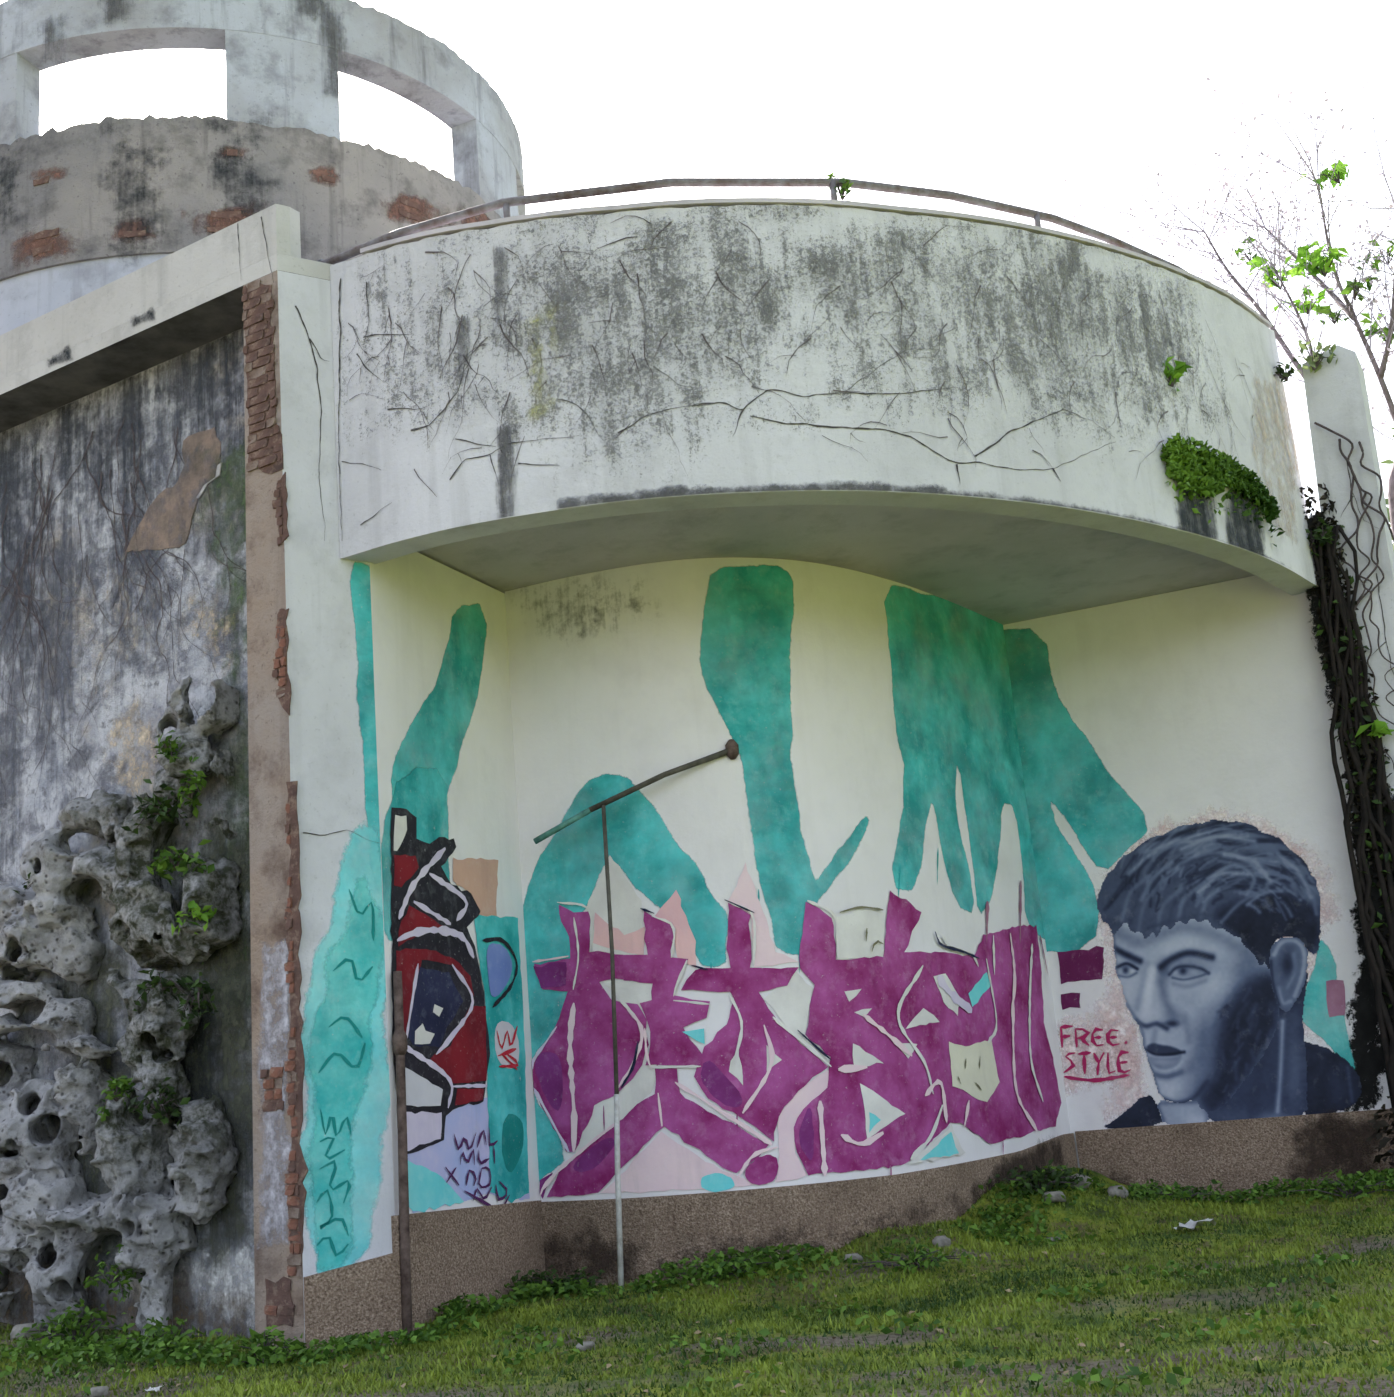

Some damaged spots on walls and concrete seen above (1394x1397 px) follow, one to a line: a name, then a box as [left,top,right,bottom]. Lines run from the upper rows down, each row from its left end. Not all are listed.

leakage [299,0,347,101]
leakage [0,335,245,862]
leakage [133,308,154,326]
peeling [126,427,223,552]
flaking render [182,207,253,233]
spalling [241,280,289,546]
spalling [272,608,292,716]
flaking render [388,195,490,228]
crack [237,216,1115,541]
leakage [339,205,1234,518]
leakage [558,383,1394,1182]
spalling [260,781,309,1327]